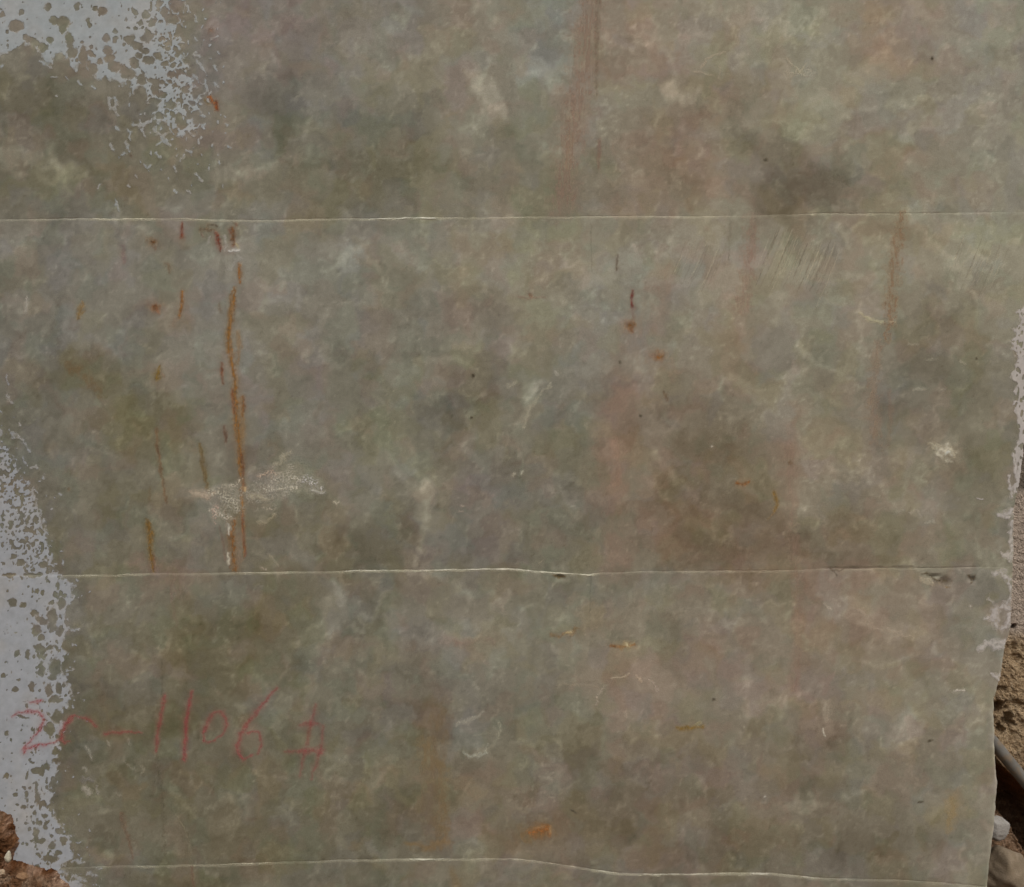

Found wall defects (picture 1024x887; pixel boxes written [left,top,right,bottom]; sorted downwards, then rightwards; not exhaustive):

peeling [0,0,213,156]
peeling [0,441,91,887]
rust [221,264,246,572]
water stain [194,468,322,535]
peeling [977,572,1012,651]
peeling [997,308,1024,559]